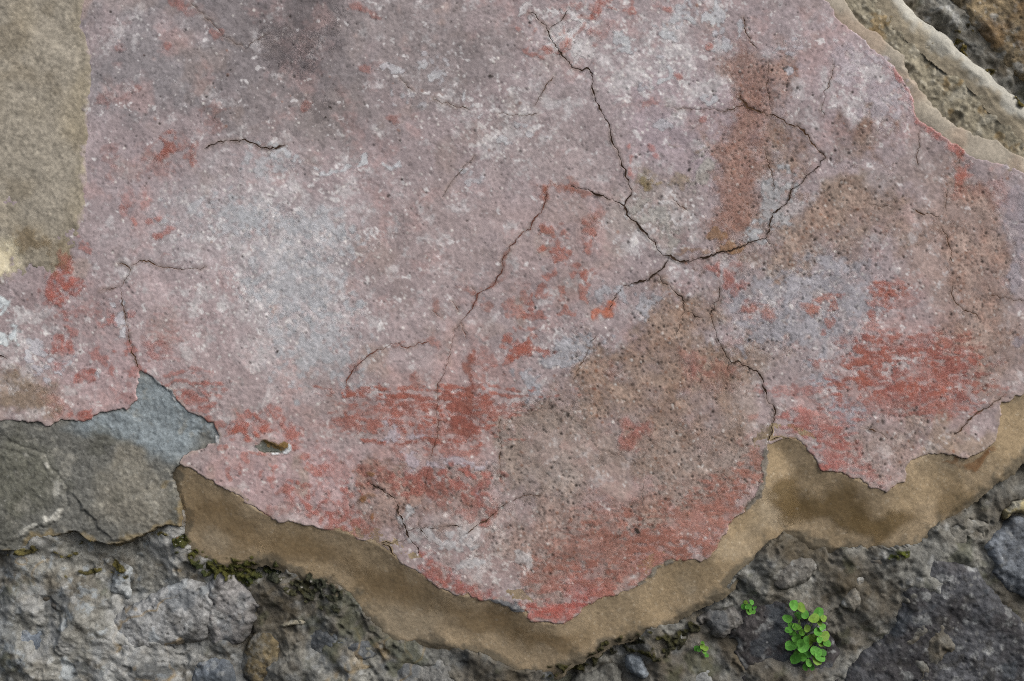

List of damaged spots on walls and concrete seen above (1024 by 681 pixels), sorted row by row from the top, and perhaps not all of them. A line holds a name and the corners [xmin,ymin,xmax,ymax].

crack [206,115,284,150]
crack [100,260,204,370]
crack [346,194,547,489]
crack [499,10,835,442]
crack [875,194,1022,320]
spalling [255,441,286,452]
spalling [356,458,487,533]
crack [365,419,538,556]
spalling [498,298,769,598]
crack [955,394,1006,434]